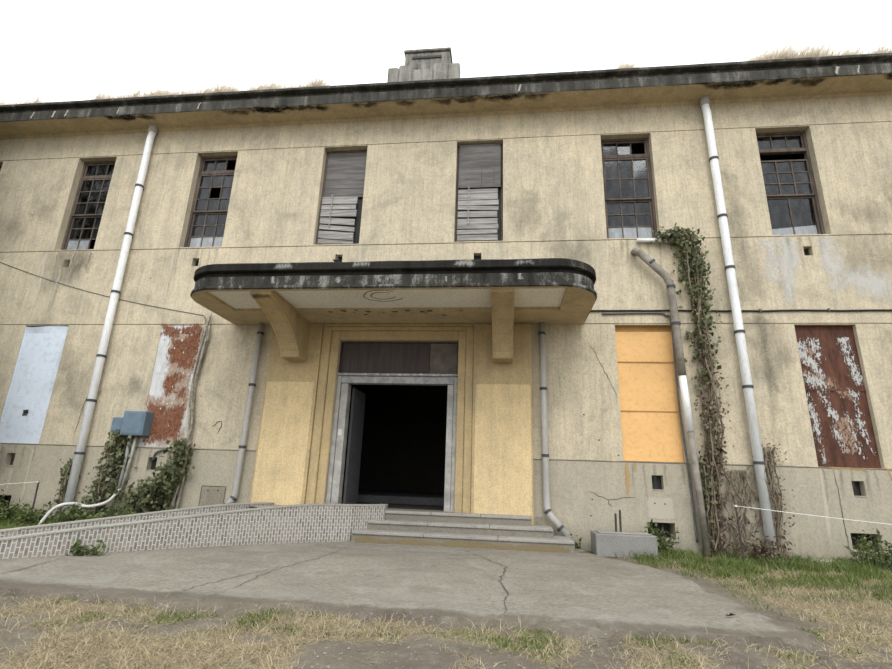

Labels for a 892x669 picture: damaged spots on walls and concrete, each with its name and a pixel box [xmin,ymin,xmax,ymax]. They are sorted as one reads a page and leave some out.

rust [143,323,203,446]
rust [800,347,855,402]
rust [833,416,861,455]
crack [453,548,509,617]